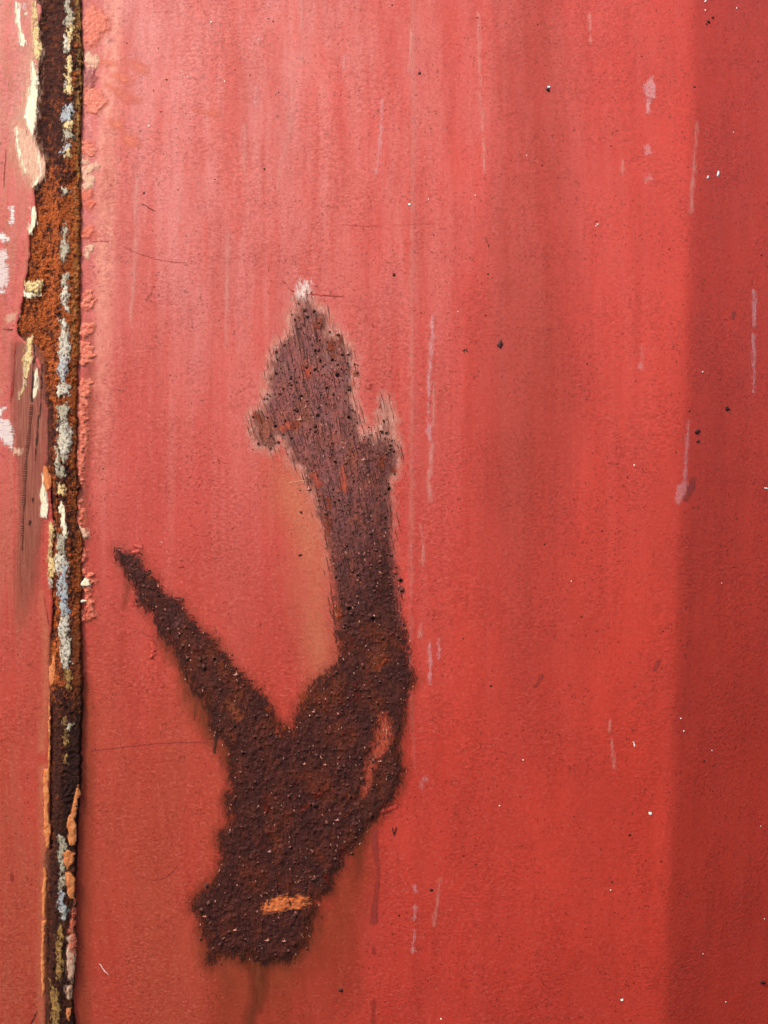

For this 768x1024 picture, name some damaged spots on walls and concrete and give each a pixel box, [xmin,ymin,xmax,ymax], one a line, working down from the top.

peeling [15,1,45,188]
peeling [0,206,14,293]
peeling [27,207,38,234]
peeling [24,279,43,298]
peeling [19,335,39,400]
peeling [0,407,23,455]
corrosion [114,280,418,1024]